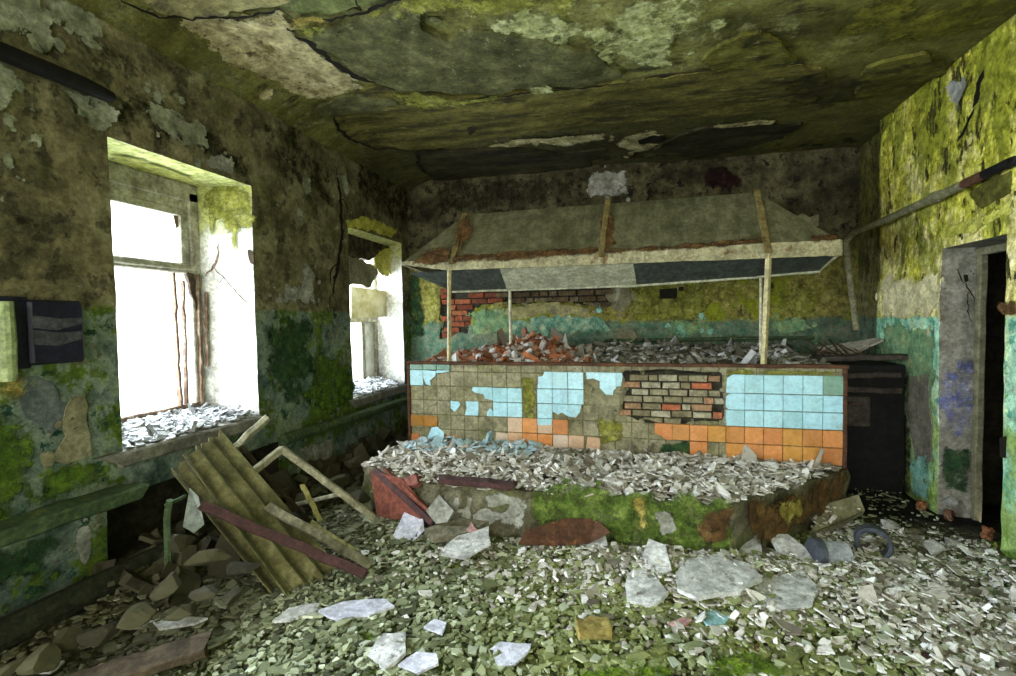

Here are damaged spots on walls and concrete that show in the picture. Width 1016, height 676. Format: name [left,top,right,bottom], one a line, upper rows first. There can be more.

peeling [0,0,107,53]
crack [121,0,413,83]
peeling [0,61,25,132]
peeling [58,84,122,134]
peeling [142,0,827,202]
peeling [27,133,43,148]
peeling [111,155,193,180]
crack [330,166,350,296]
peeling [939,171,1016,240]
flaking render [997,300,1016,316]
spalling [589,368,724,426]